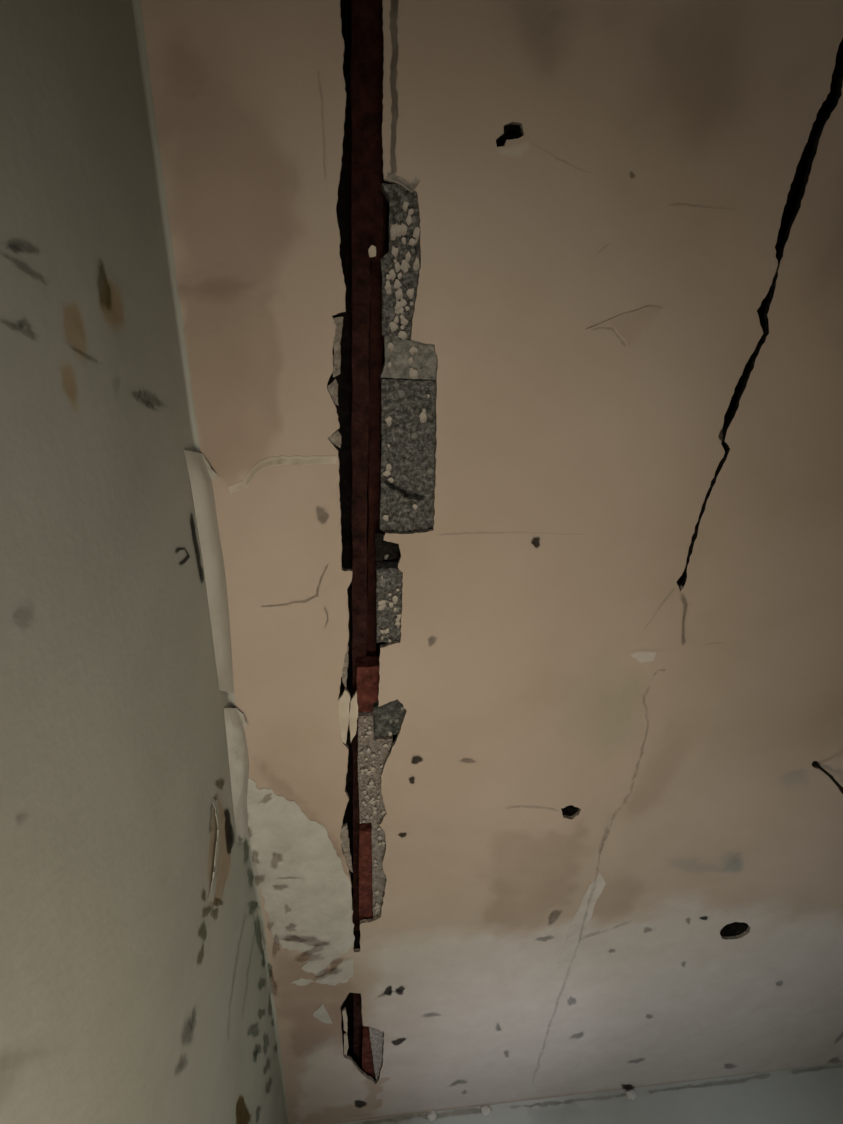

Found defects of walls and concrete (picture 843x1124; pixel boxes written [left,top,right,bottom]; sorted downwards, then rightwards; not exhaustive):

crack [775,38,843,259]
spalling [375,172,437,643]
crack [677,285,772,585]
peeling [207,798,234,902]
peeling [247,777,355,986]
spalling [357,699,406,917]
spalling [369,1027,384,1080]